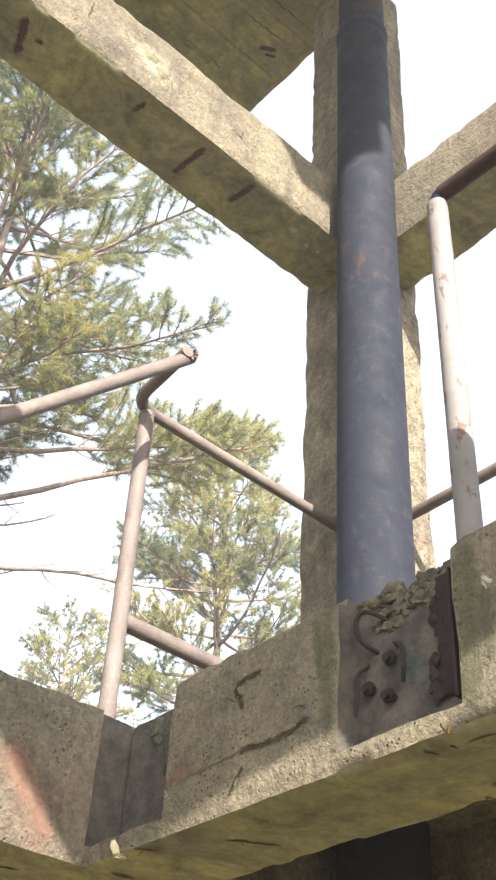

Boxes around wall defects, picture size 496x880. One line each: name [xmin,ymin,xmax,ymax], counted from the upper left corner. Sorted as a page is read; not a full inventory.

rust [15,18,29,53]
rust [172,148,206,173]
spalling [354,565,462,703]
spalling [354,664,397,717]